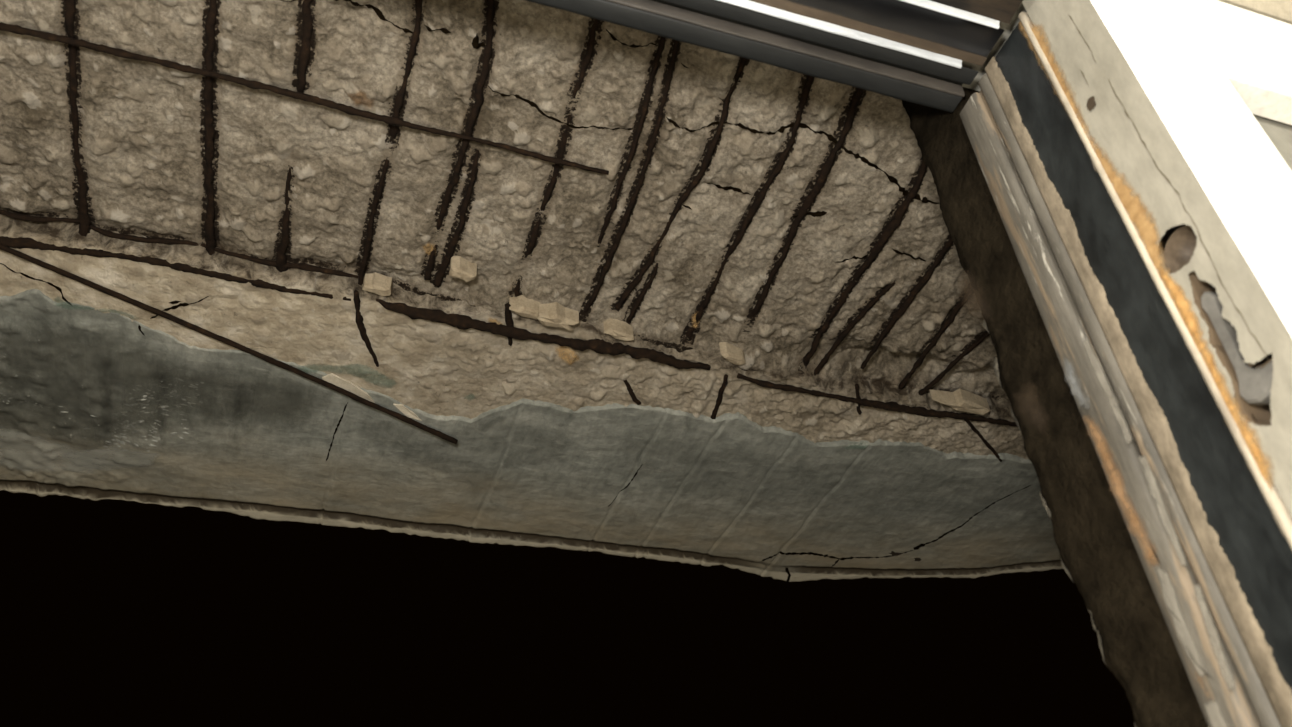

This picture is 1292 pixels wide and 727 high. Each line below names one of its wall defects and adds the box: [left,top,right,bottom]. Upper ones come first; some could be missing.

spalling [0,0,1029,459]
crack [487,85,634,130]
crack [683,183,751,210]
crack [666,99,939,204]
crack [793,210,827,218]
crack [841,249,928,262]
rust [1020,21,1271,488]
water stain [0,336,310,471]
rust [557,346,578,364]
crack [762,485,1031,582]